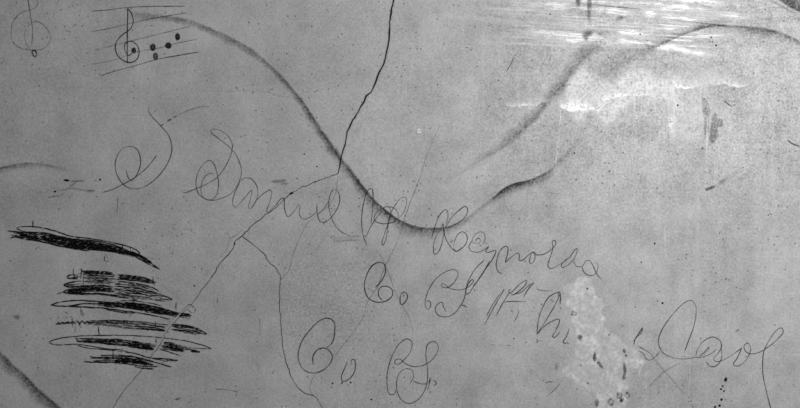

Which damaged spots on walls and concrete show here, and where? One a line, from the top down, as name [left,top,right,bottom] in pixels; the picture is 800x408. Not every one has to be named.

crack [114,0,394,407]